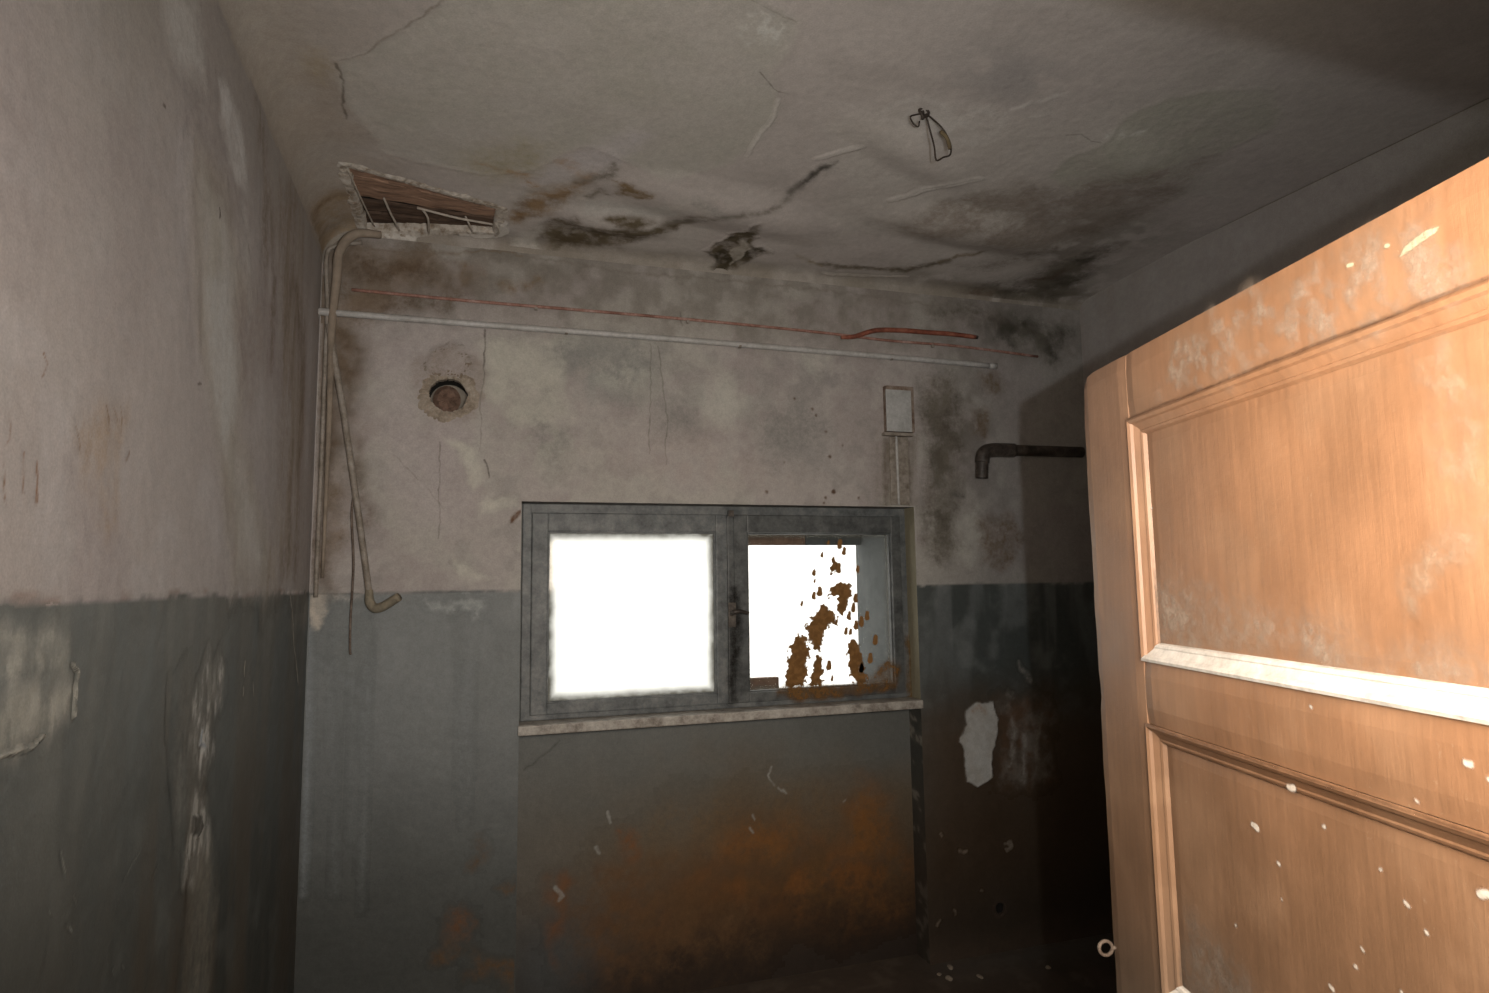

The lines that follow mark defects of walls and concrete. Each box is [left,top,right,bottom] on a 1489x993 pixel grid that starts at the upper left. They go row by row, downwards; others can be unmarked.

spalling [336,162,511,241]
leakage [179,68,867,636]
spalling [701,221,776,271]
leakage [791,144,1240,582]
peeling [0,601,82,782]
leakage [164,638,230,993]
rust [516,753,916,993]
peeling [958,699,998,789]